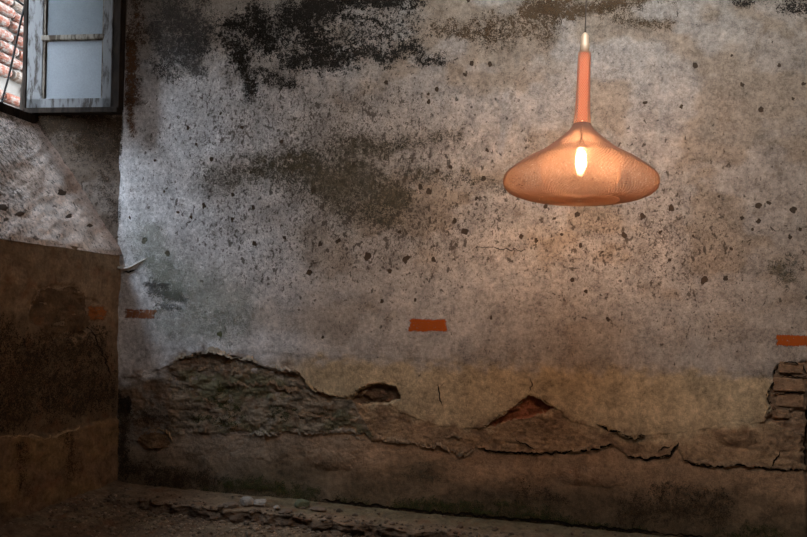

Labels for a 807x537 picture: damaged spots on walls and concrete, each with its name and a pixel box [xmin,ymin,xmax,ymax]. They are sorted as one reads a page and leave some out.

damp [143,0,677,111]
damp [732,0,807,19]
damp [194,129,529,230]
damp [0,315,224,495]
spalling [167,346,400,441]
spalling [484,379,559,428]
spalling [764,359,807,436]